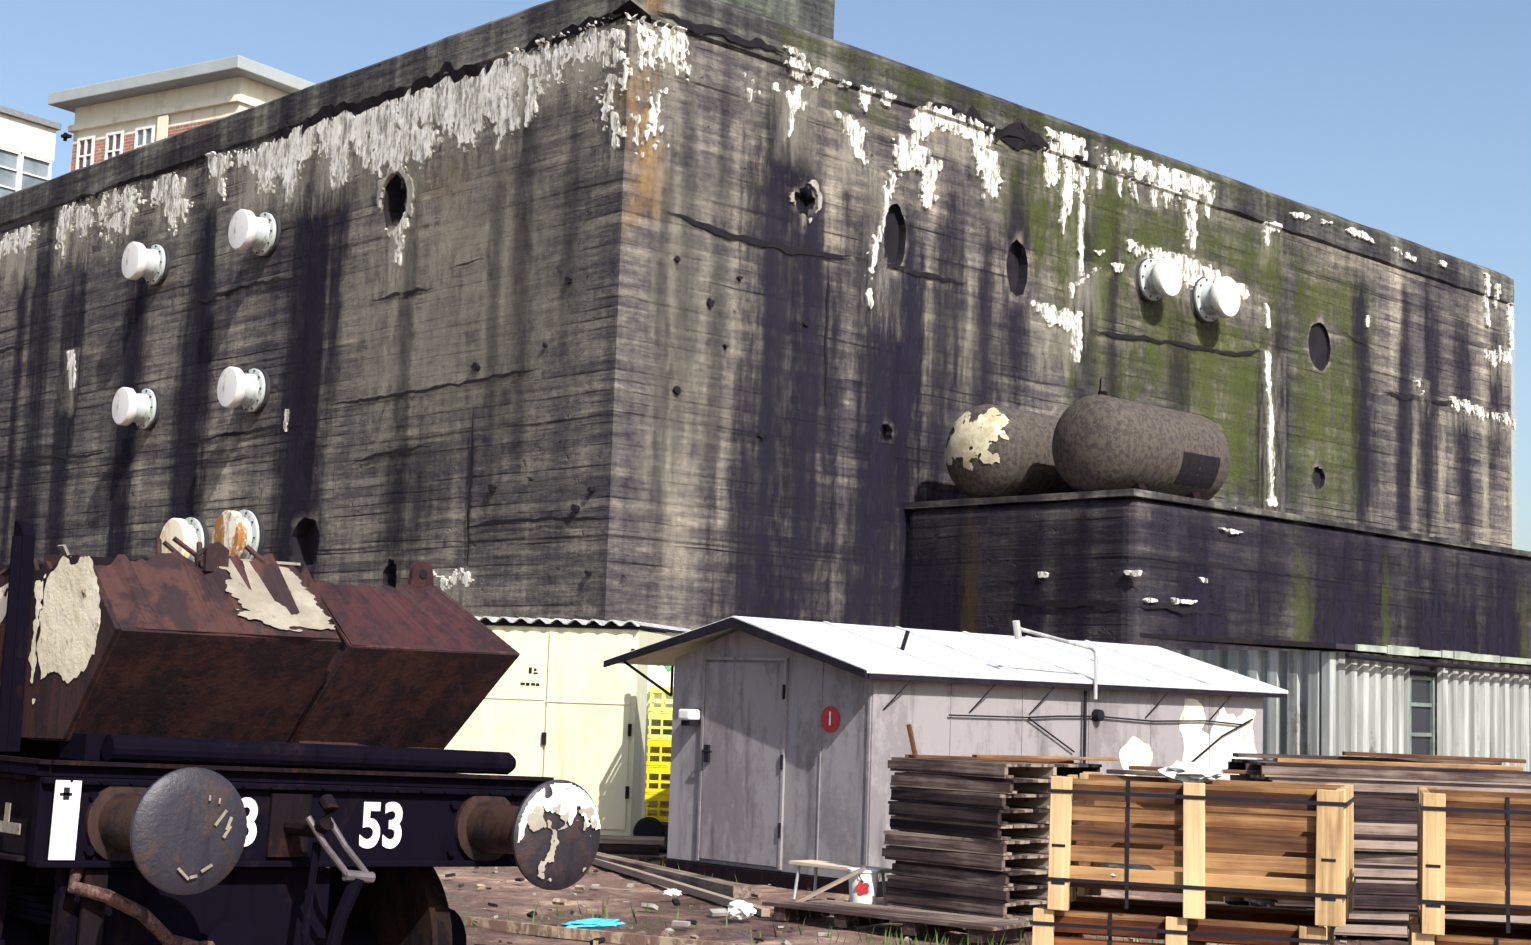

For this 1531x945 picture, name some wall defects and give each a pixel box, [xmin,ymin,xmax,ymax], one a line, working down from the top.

crack [0,11,784,237]
damp [0,251,86,563]
damp [107,422,136,558]
damp [120,277,147,393]
damp [164,201,216,526]
damp [273,162,350,579]
crack [665,211,967,404]
damp [712,88,1375,650]
damp [1301,544,1524,661]
damp [1397,281,1487,542]
damp [1491,338,1513,455]